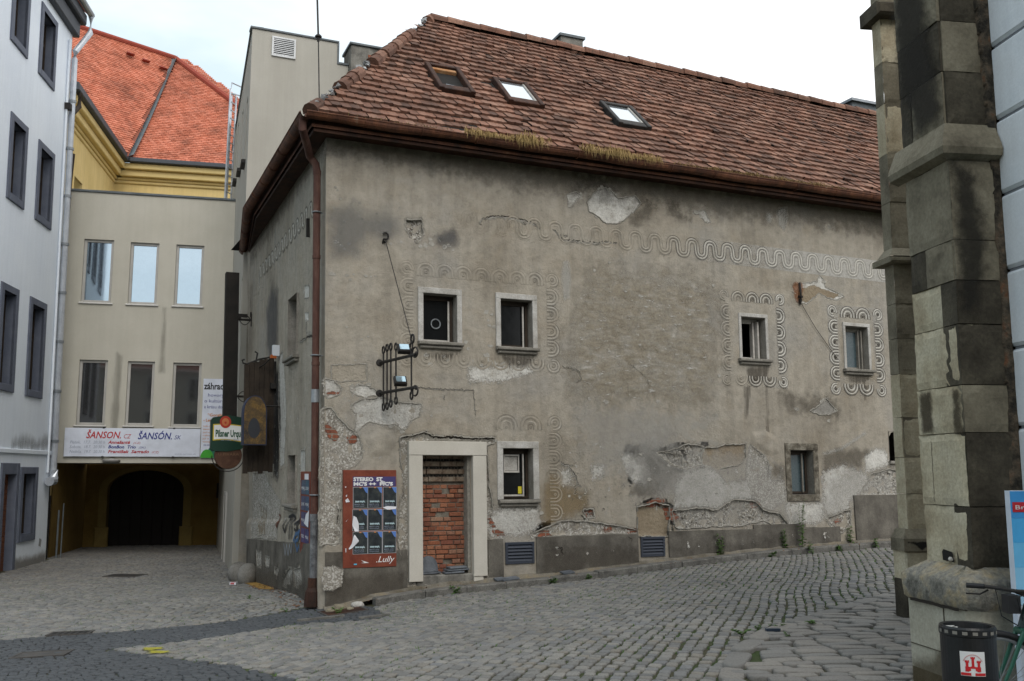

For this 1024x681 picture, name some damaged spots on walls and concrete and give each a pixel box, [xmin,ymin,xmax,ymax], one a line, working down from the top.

flaking render [566,185,641,225]
damp [438,232,456,244]
flaking render [792,275,845,305]
flaking render [463,340,533,384]
flaking render [251,351,544,591]
flaking render [557,435,889,538]